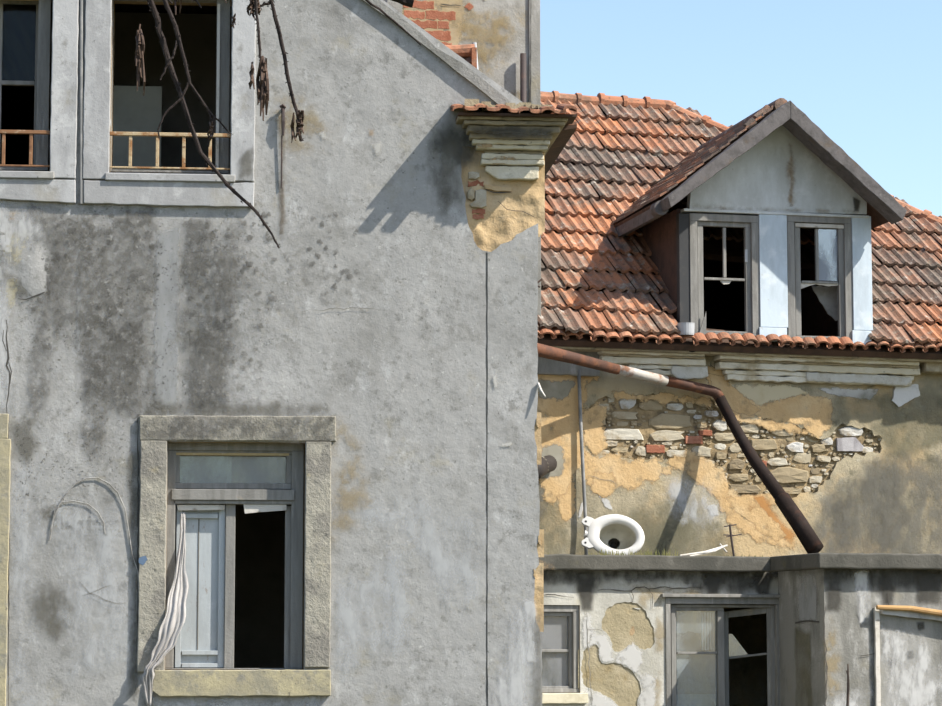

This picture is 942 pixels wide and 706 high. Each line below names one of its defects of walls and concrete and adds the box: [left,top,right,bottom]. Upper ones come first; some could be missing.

flaking render [402,0,468,45]
flaking render [461,147,545,252]
water stain [0,203,332,451]
peeling [891,384,920,407]
water stain [16,422,34,459]
flaking render [534,366,881,549]
water stain [818,396,942,554]
water stain [579,579,593,610]
water stain [705,574,720,594]
water stain [828,572,841,610]
flaking render [578,602,656,706]